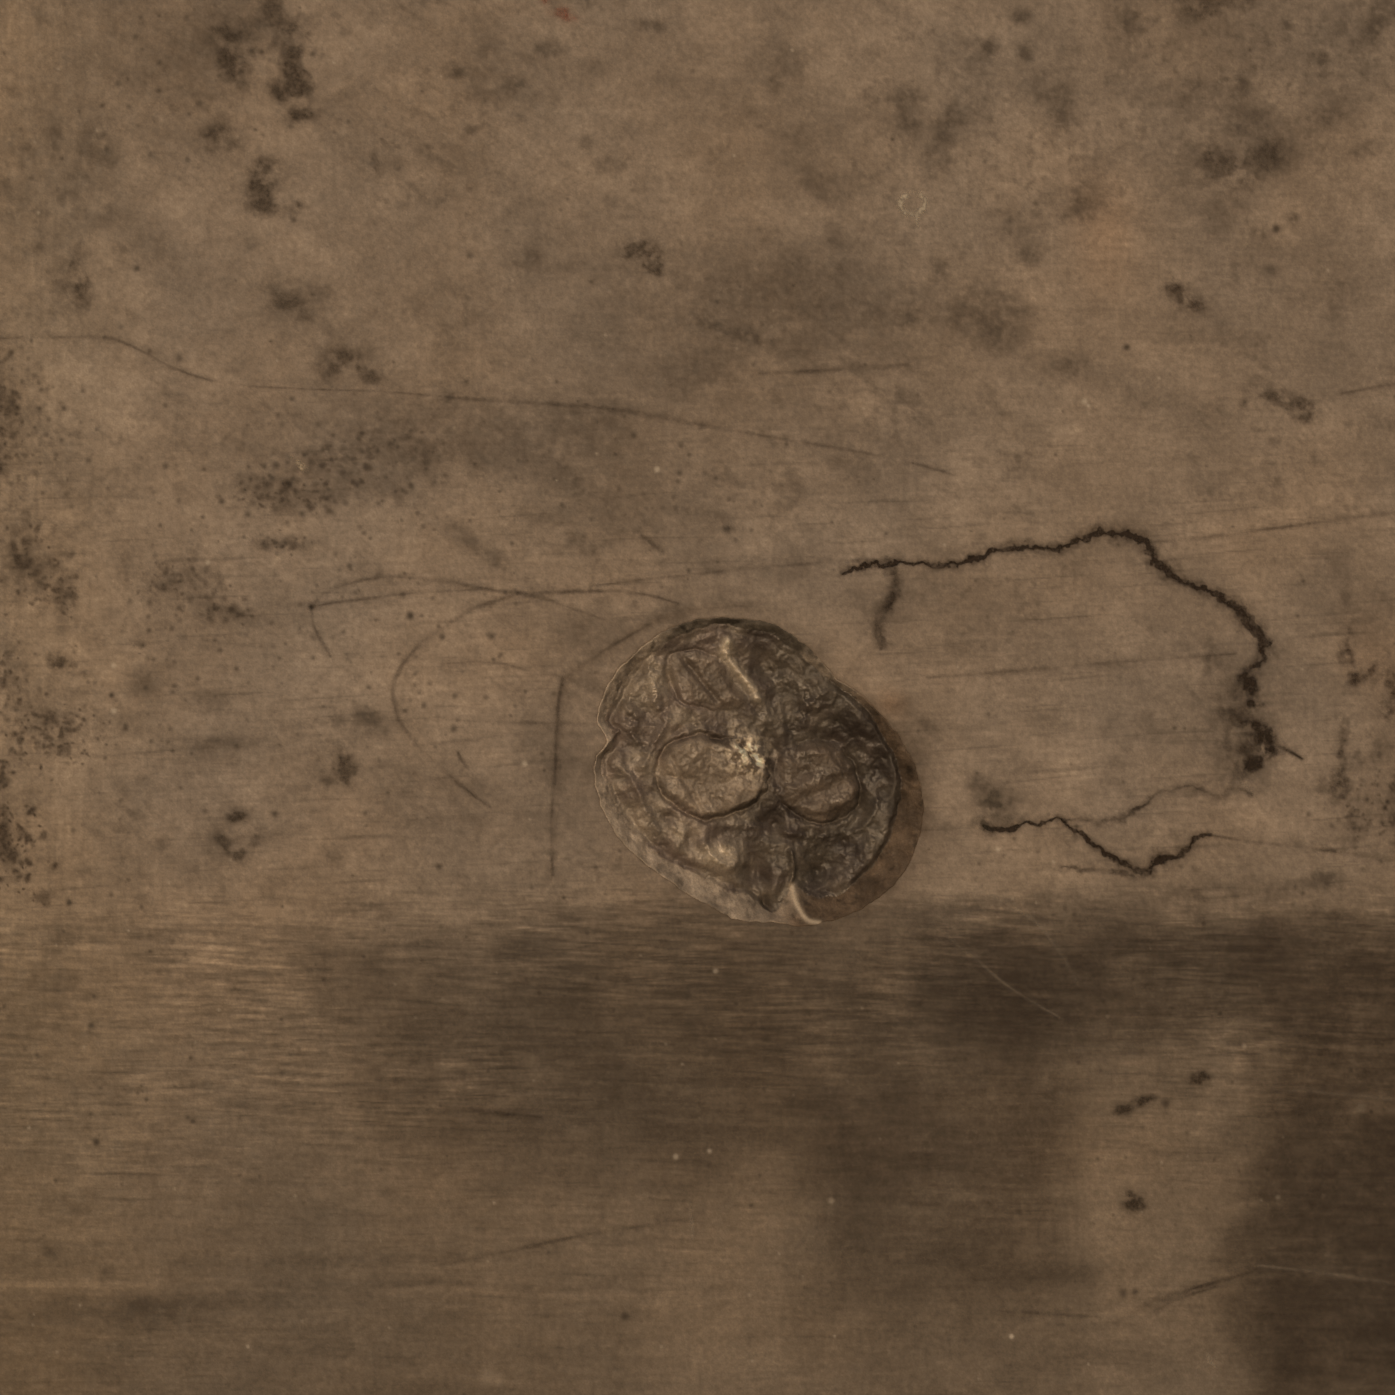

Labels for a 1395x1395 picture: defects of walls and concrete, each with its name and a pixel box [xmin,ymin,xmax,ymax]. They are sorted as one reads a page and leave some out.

crack [841,526,1303,772]
crack [982,817,1211,876]
leakage [1257,940,1395,1382]